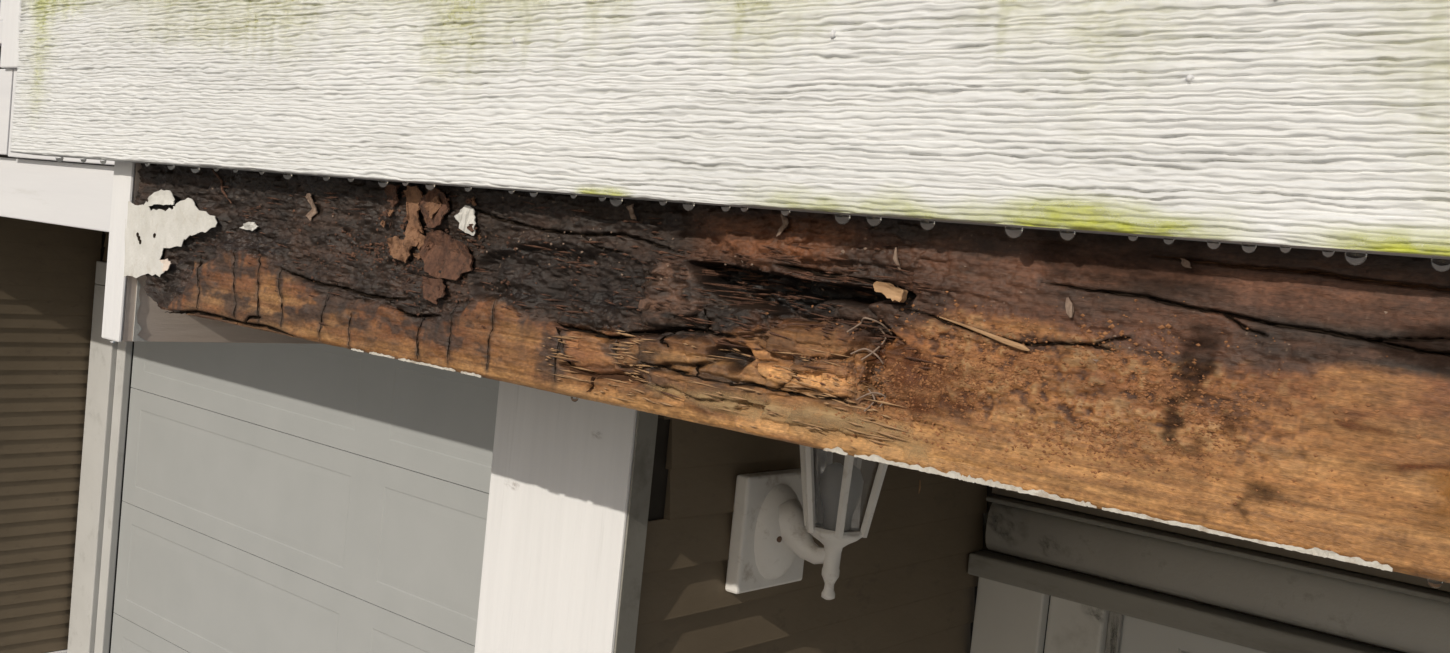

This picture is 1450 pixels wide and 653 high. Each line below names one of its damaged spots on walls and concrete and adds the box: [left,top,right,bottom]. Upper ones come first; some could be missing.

peeling [305,193,317,221]
peeling [240,222,259,231]
peeling [380,184,482,305]
leakage [1013,205,1192,284]
leakage [1345,237,1450,257]
peeling [124,190,217,342]
crack [1152,255,1450,291]
crack [774,264,1131,351]
crack [1044,282,1450,356]
peeling [351,348,481,378]
leakage [1398,464,1450,497]